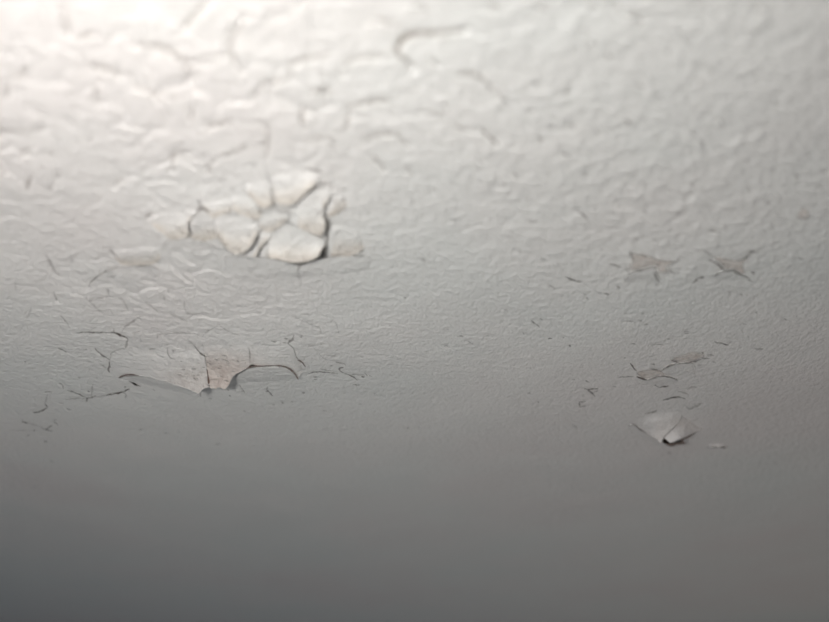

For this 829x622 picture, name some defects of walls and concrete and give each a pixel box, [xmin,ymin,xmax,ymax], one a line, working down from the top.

peeling [110,341,305,395]
peeling [629,411,702,450]